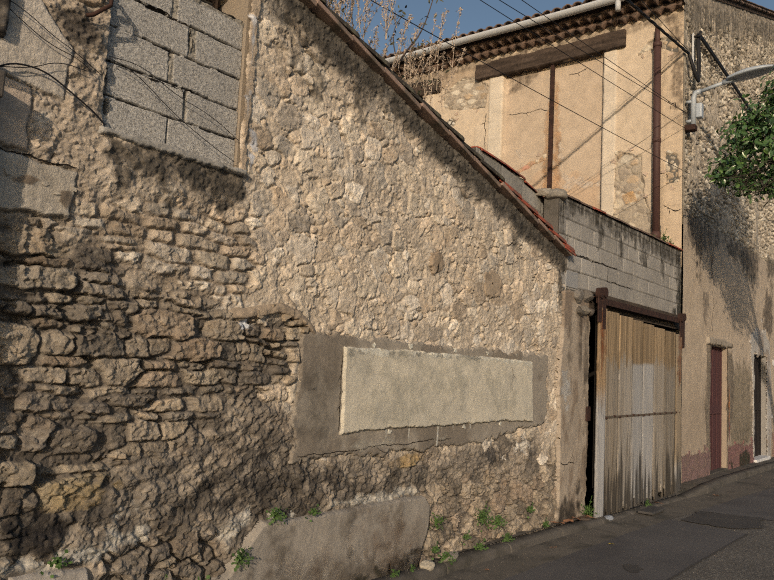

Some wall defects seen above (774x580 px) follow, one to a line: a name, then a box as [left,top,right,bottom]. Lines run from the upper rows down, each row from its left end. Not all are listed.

crack [0,147,76,168]
peeling [4,168,77,207]
spalling [611,147,652,234]
water stain [688,195,759,286]
water stain [762,293,772,335]
peeling [355,342,390,357]
peeling [408,344,460,360]
peeling [479,351,533,367]
crack [298,438,450,458]